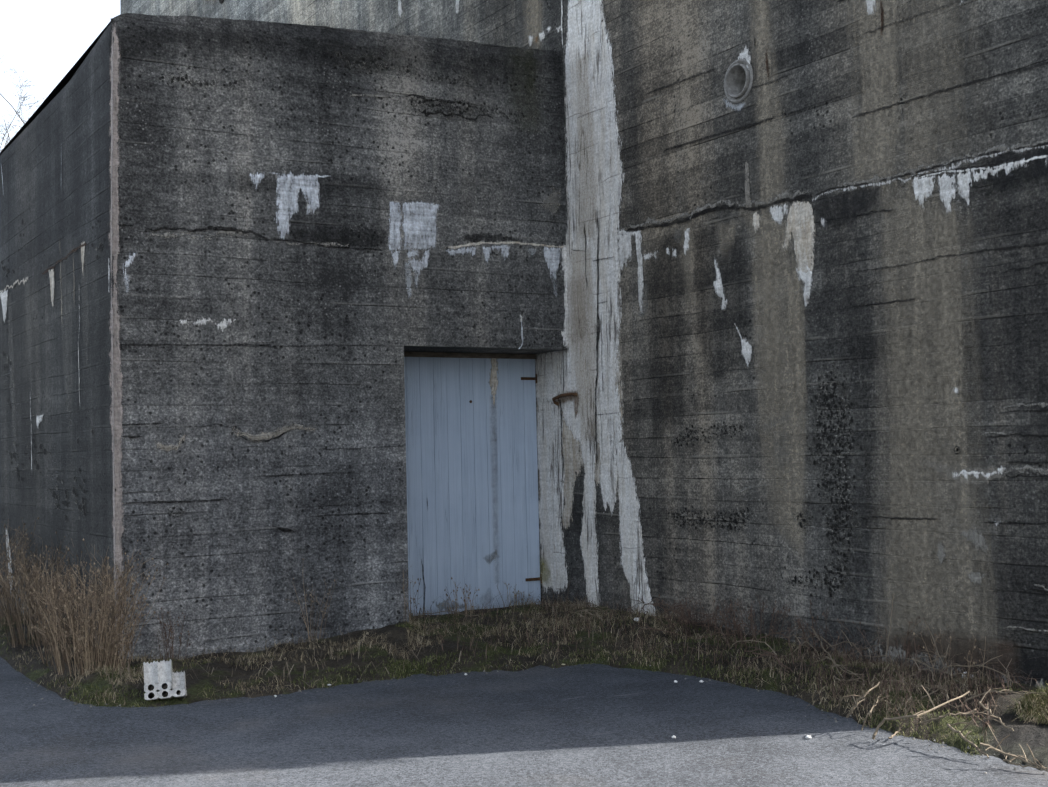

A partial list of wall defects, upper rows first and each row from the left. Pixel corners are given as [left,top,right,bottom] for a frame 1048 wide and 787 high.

crack [648,69,715,94]
crack [665,62,1048,151]
water stain [988,148,1048,190]
crack [120,224,384,251]
water stain [416,0,655,616]
water stain [683,228,700,284]
water stain [701,0,804,551]
crack [574,138,1048,463]
water stain [886,200,1048,683]
crack [929,402,1048,484]
crack [862,514,937,522]
crack [1002,626,1048,635]